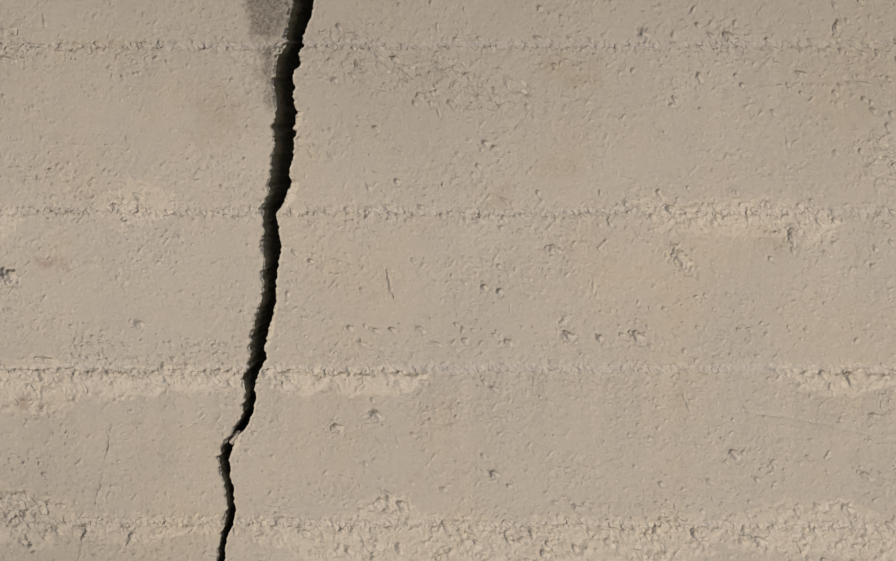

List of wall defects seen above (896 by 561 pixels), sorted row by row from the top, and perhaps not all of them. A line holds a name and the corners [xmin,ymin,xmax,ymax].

crack [215,0,316,561]